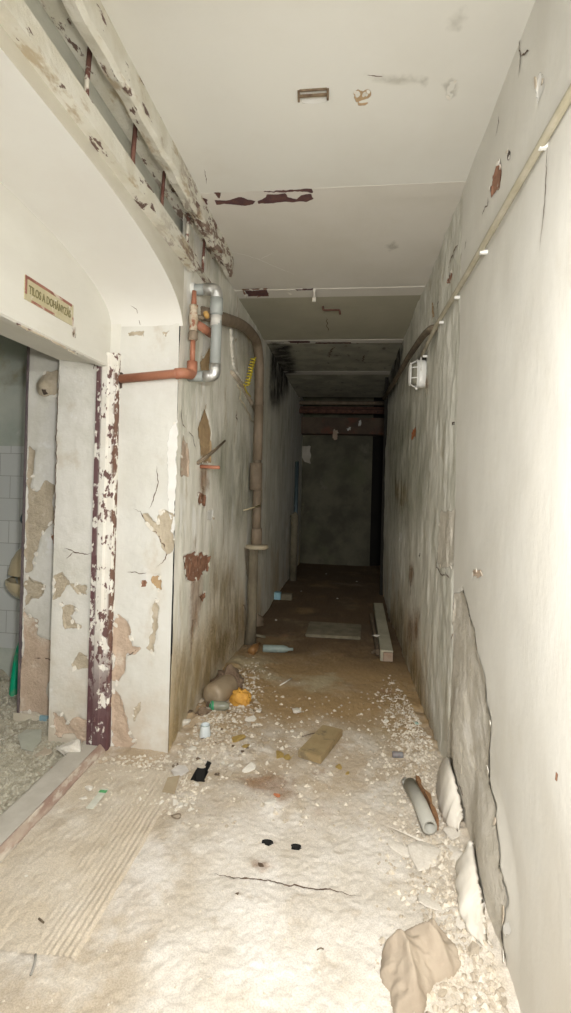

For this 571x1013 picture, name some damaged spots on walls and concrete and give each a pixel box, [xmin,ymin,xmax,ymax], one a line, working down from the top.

flaking render [353,89,371,106]
flaking render [489,150,511,197]
flaking render [19,446,89,742]
flaking render [111,575,162,747]
flaking render [447,590,507,963]
crack [217,874,355,896]